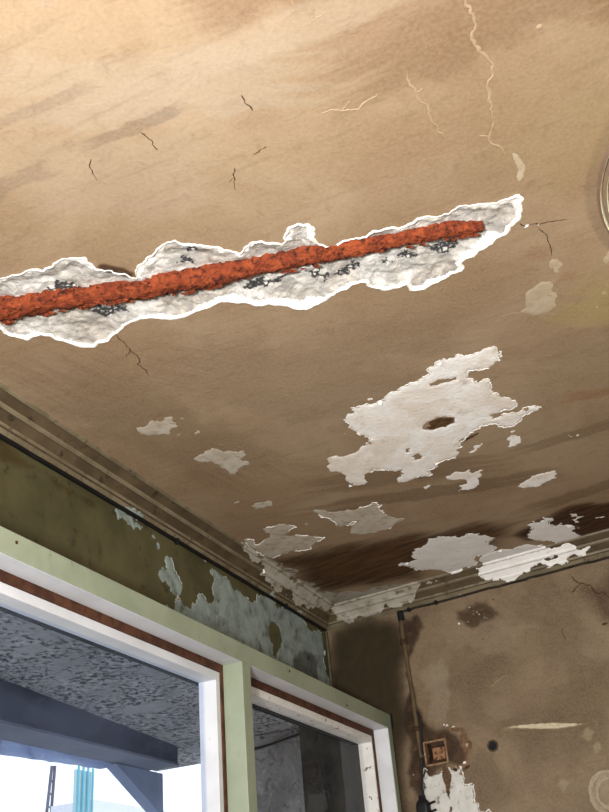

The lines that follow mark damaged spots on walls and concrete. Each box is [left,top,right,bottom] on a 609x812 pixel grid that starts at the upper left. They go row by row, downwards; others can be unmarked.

crack [406,71,445,137]
crack [463,0,506,154]
rust [99,265,133,277]
spalling [0,194,524,348]
peeling [194,448,249,474]
peeling [327,346,542,491]
peeling [313,502,405,534]
leakage [277,524,504,590]
peeling [398,514,590,582]
peeling [152,523,437,686]
leakage [332,621,407,812]
peeling [413,724,491,812]